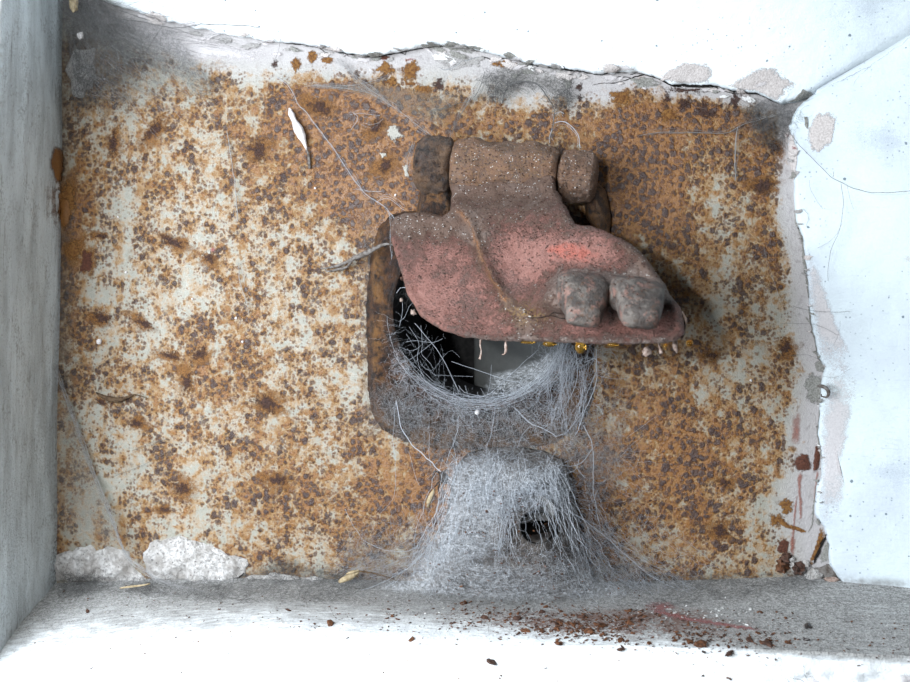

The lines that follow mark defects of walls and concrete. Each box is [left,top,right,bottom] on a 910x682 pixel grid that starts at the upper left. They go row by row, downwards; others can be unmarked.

rust [290,50,333,73]
crack [285,43,424,57]
rust [372,56,444,100]
flaking render [421,41,588,94]
crack [439,57,778,104]
spalling [601,63,812,103]
peeling [784,127,799,179]
spalling [804,113,837,152]
rust [156,232,218,269]
rust [125,313,154,332]
rust [153,346,212,395]
rust [770,446,820,533]